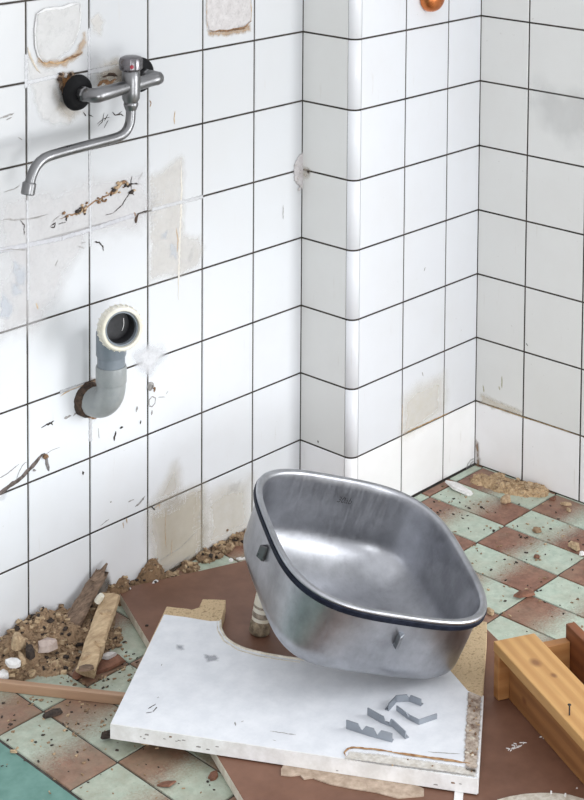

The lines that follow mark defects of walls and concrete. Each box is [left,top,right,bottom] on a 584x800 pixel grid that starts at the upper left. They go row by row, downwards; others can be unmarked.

peeling [206,0,252,35]